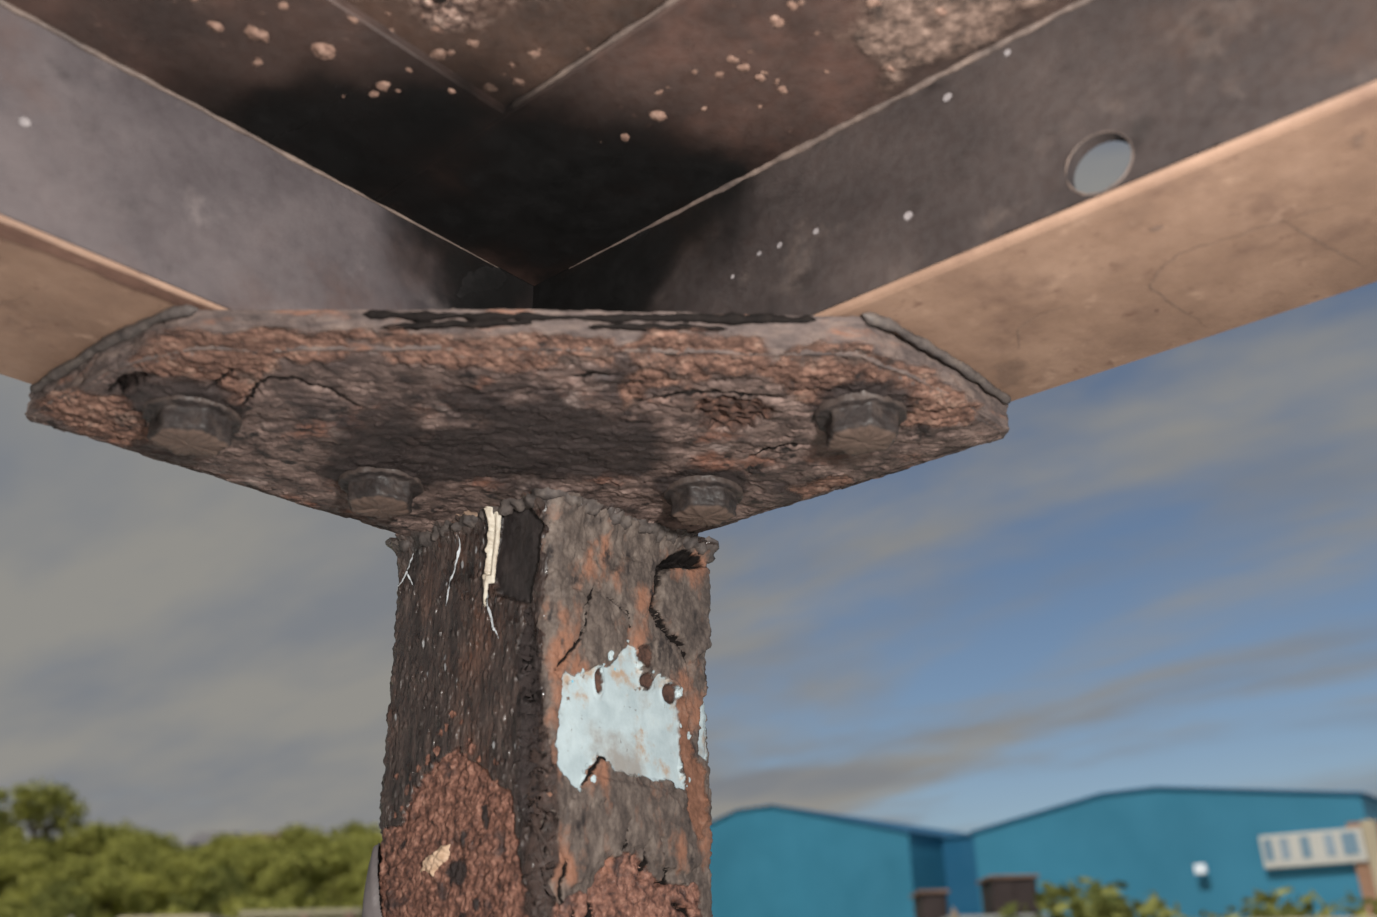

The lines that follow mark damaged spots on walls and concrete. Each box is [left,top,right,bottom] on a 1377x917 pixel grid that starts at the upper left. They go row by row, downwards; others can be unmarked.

rust [311,43,336,60]
water stain [215,72,767,312]
rust [0,222,216,310]
crack [214,369,358,406]
rust [129,326,984,427]
water stain [321,389,747,493]
peeling [482,506,502,607]
crack [555,549,701,671]
peeling [555,640,707,792]
spalling [362,710,528,917]
rust [676,697,709,840]
spalling [550,848,702,917]